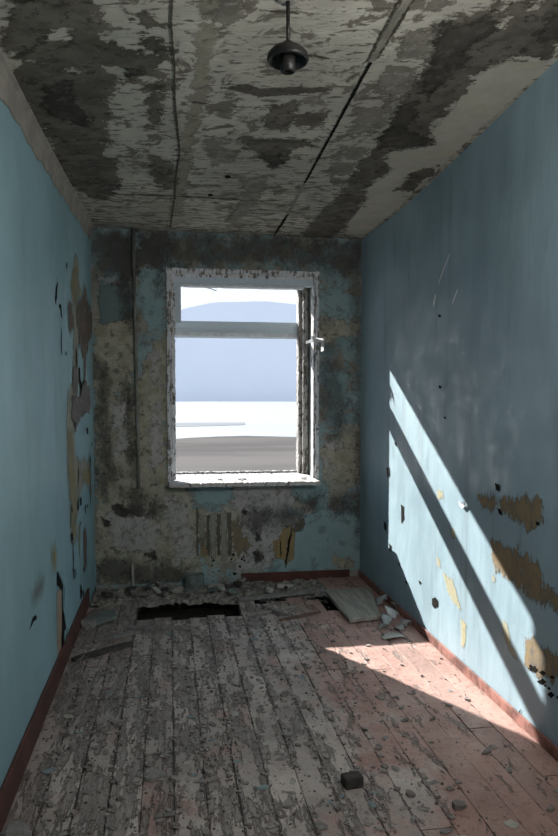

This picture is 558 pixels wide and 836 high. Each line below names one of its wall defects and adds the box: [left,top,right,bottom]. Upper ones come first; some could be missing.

flaking render [66,256,361,599]
peeling [477,483,544,534]
peeling [57,572,67,655]
peeling [437,558,460,609]
peeling [490,537,558,612]